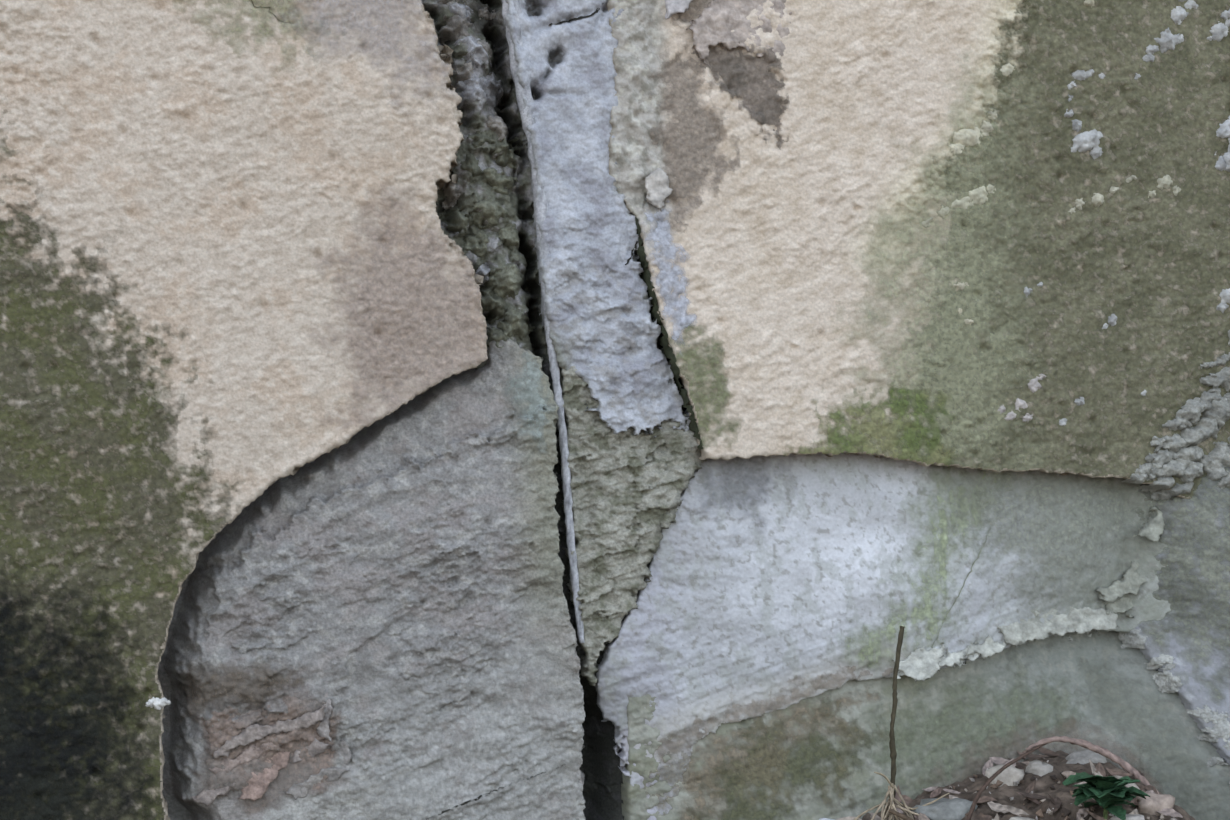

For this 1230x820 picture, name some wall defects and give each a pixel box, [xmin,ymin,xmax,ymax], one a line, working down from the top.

crack [421,0,554,394]
crack [534,8,600,25]
peeling [645,168,673,211]
peeling [665,0,792,149]
efflorescence [1064,69,1105,159]
efflorescence [1134,0,1199,79]
efflorescence [1207,9,1230,42]
efflorescence [1214,116,1230,172]
crack [625,217,703,450]
crack [423,423,624,820]
spalling [145,330,1230,820]
water stain [0,592,153,820]